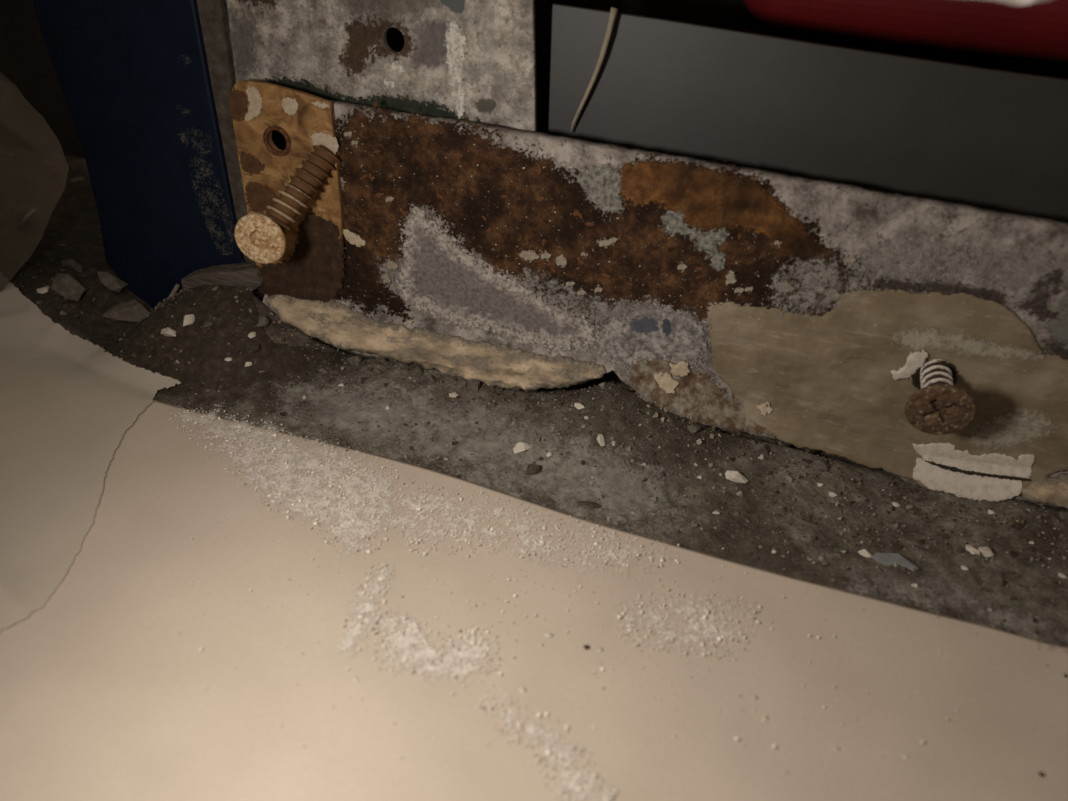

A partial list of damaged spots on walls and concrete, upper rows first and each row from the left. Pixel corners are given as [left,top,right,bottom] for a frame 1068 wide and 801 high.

rust [228,87,248,122]
rust [240,151,278,213]
rust [253,99,1068,439]
peeling [707,288,1068,502]